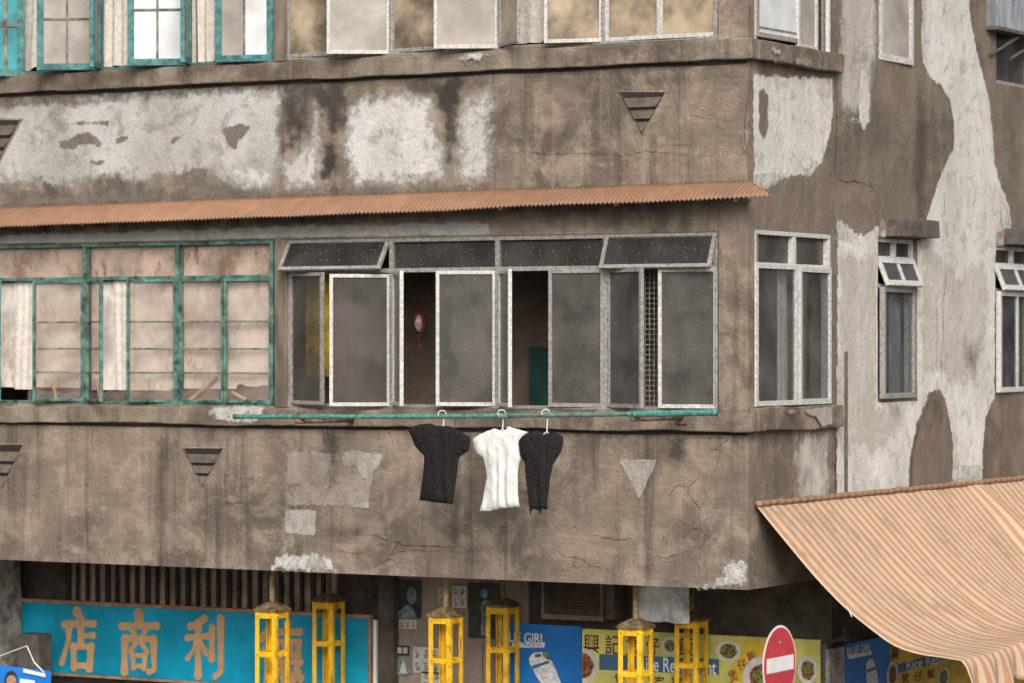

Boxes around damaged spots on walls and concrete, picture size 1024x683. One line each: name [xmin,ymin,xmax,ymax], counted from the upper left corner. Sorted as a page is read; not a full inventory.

peeling [0,87,324,190]
leakage [285,85,347,148]
leakage [412,76,485,142]
crack [829,77,873,190]
peeling [787,0,1011,497]
spalling [208,405,264,424]
crack [656,478,718,560]
spalling [271,552,337,573]
spalling [702,560,748,589]